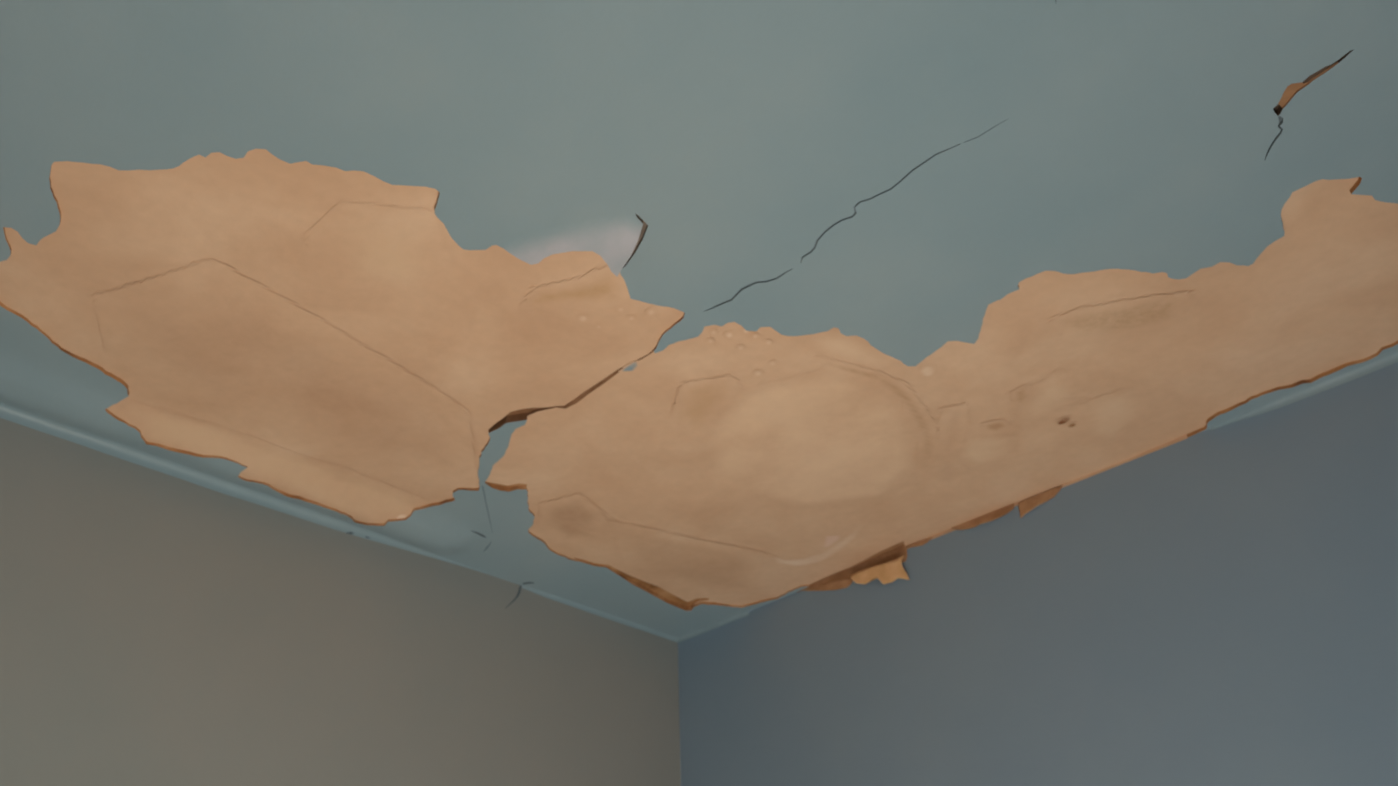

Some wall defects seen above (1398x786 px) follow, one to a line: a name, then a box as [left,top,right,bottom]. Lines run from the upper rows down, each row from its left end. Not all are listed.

crack [706,120,1006,311]
crack [1265,116,1283,159]
flaking render [0,149,1398,611]